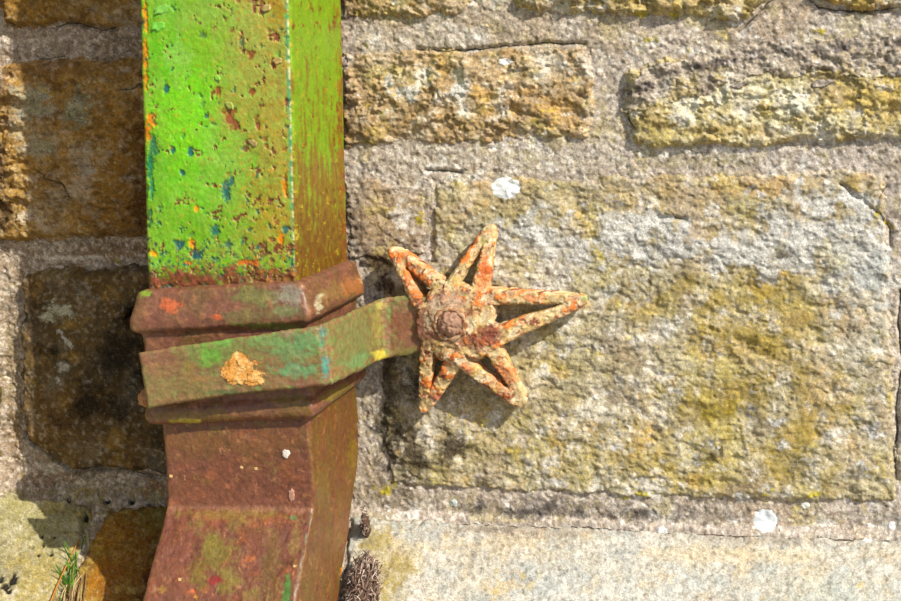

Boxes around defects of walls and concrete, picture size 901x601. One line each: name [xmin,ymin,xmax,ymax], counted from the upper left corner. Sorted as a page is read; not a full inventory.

crack [809,0,897,13]
damp [97,312,145,388]
crack [893,290,901,477]